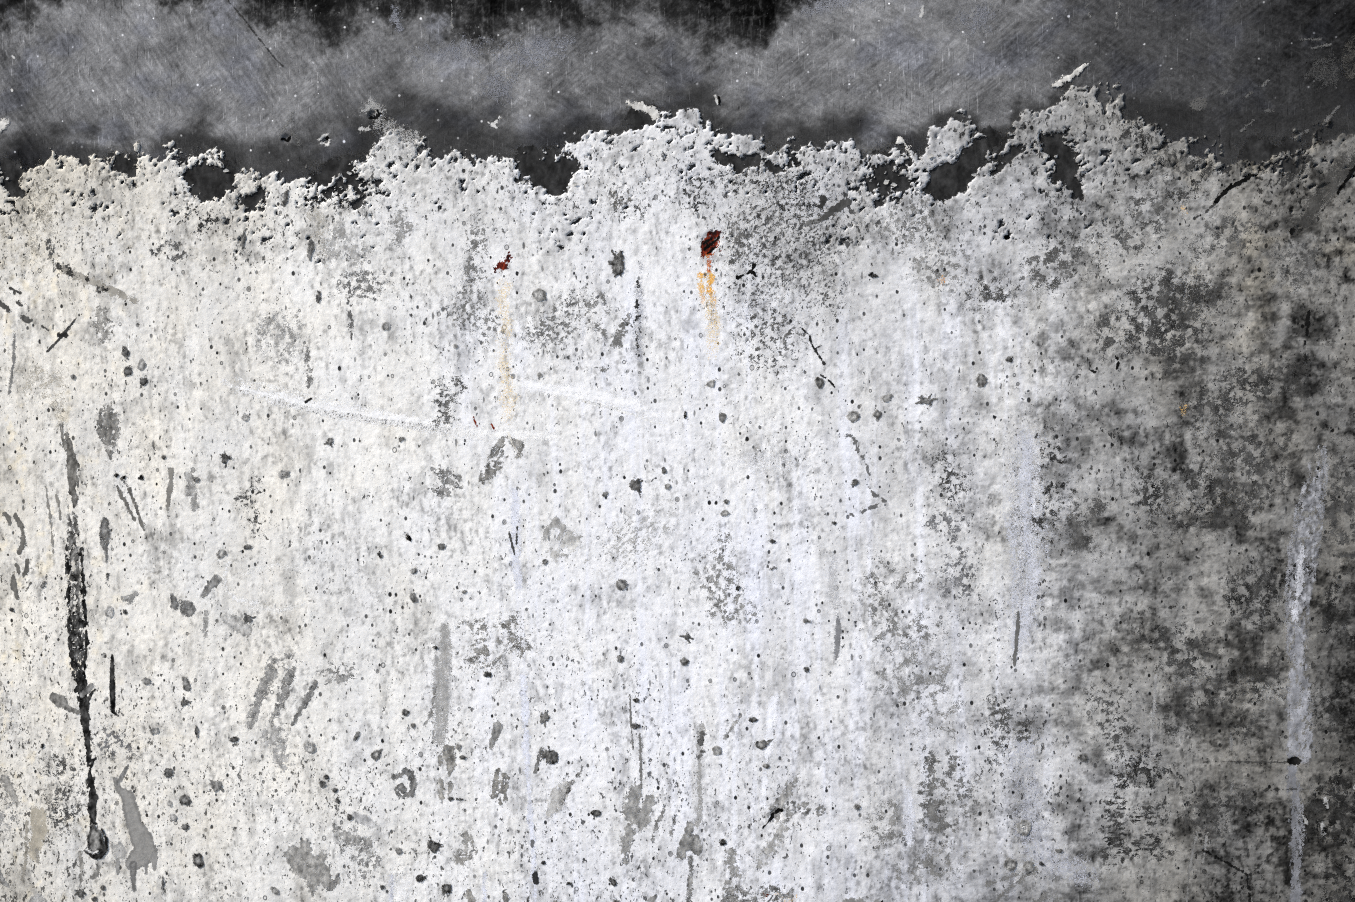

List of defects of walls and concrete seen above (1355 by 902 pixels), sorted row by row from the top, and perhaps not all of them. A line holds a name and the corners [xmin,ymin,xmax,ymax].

peeling [178,155,268,220]
peeling [305,133,382,210]
peeling [514,144,588,197]
peeling [709,143,799,174]
peeling [852,126,1087,209]
corrosion [473,251,518,431]
corrosion [697,230,724,360]
leakage [674,162,854,387]
leakage [827,112,1355,902]
leakage [0,359,149,881]
leakage [691,524,759,629]
leakage [694,722,706,827]